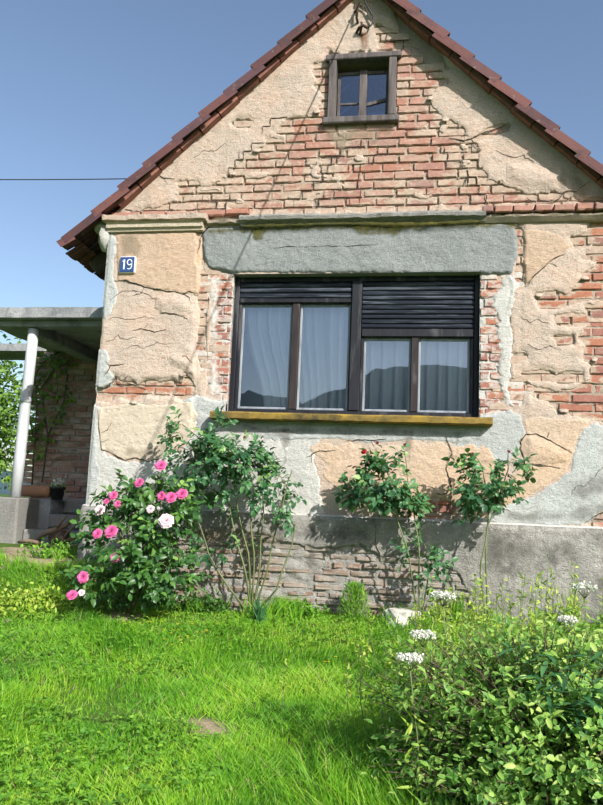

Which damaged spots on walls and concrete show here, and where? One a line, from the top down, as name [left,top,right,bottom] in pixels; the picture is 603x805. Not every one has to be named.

spalling [141,16,603,219]
crack [444,122,534,204]
crack [526,181,590,203]
crack [103,279,197,389]
peeling [310,222,603,520]
crack [98,411,160,462]
crack [520,433,573,468]
flaking render [161,530,470,617]